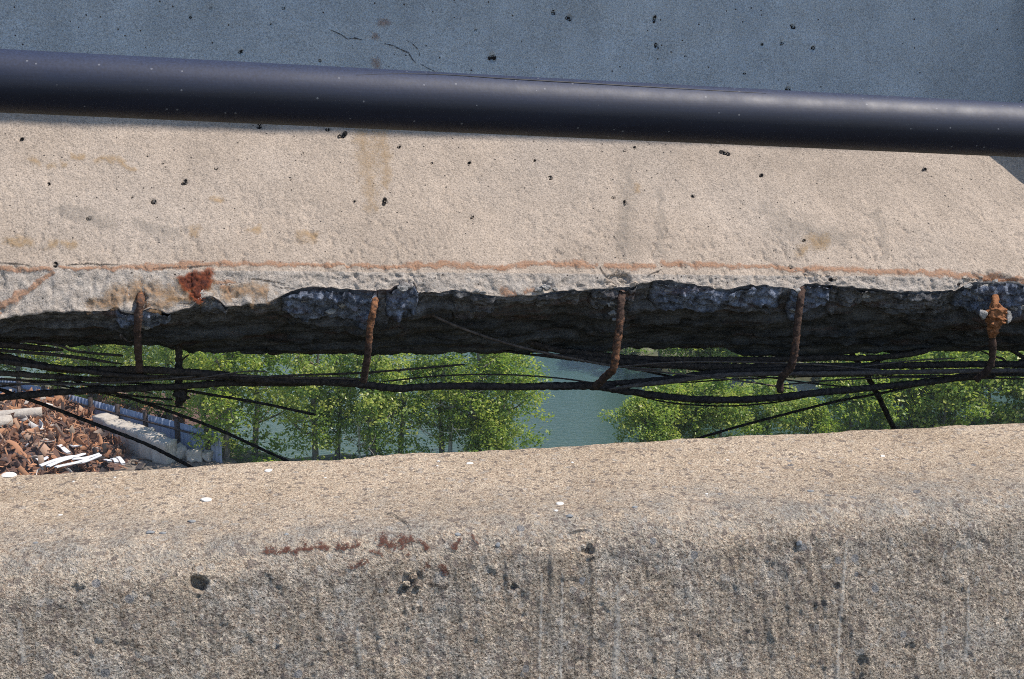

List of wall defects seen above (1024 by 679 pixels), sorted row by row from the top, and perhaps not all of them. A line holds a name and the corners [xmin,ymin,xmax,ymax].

crack [329,29,434,71]
spalling [114,307,173,330]
spalling [200,294,228,318]
spalling [280,281,421,330]
spalling [450,289,499,313]
rust [0,260,1024,313]
spalling [534,266,1024,324]
rust [262,533,449,576]